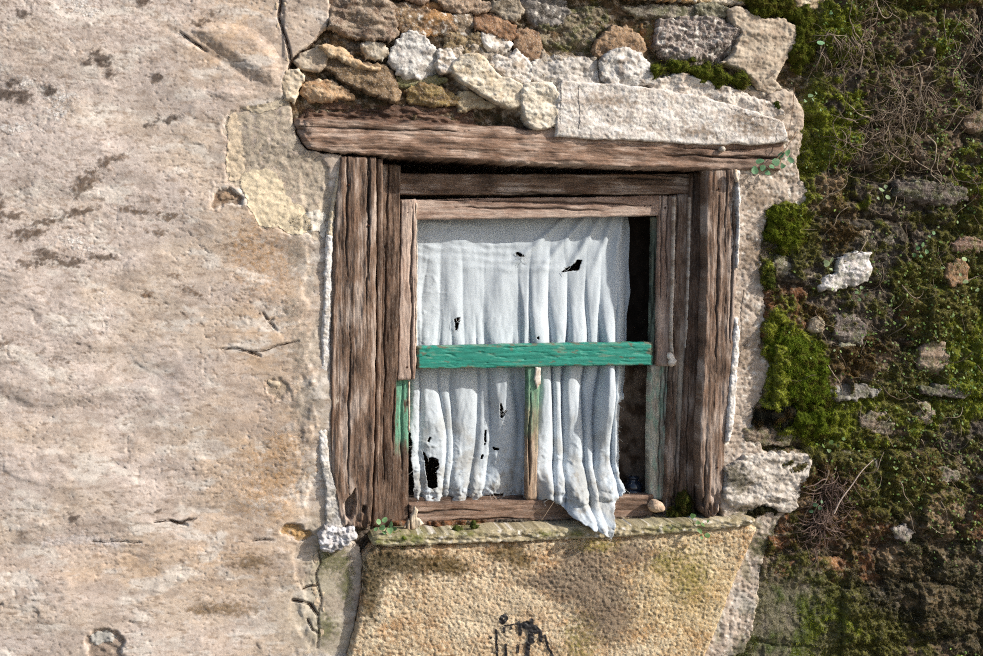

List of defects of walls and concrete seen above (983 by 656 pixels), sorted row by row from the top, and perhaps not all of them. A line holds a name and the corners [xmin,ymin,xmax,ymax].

crack [275,0,320,69]
spalling [212,99,330,240]
crack [228,313,297,356]
crack [292,551,325,647]